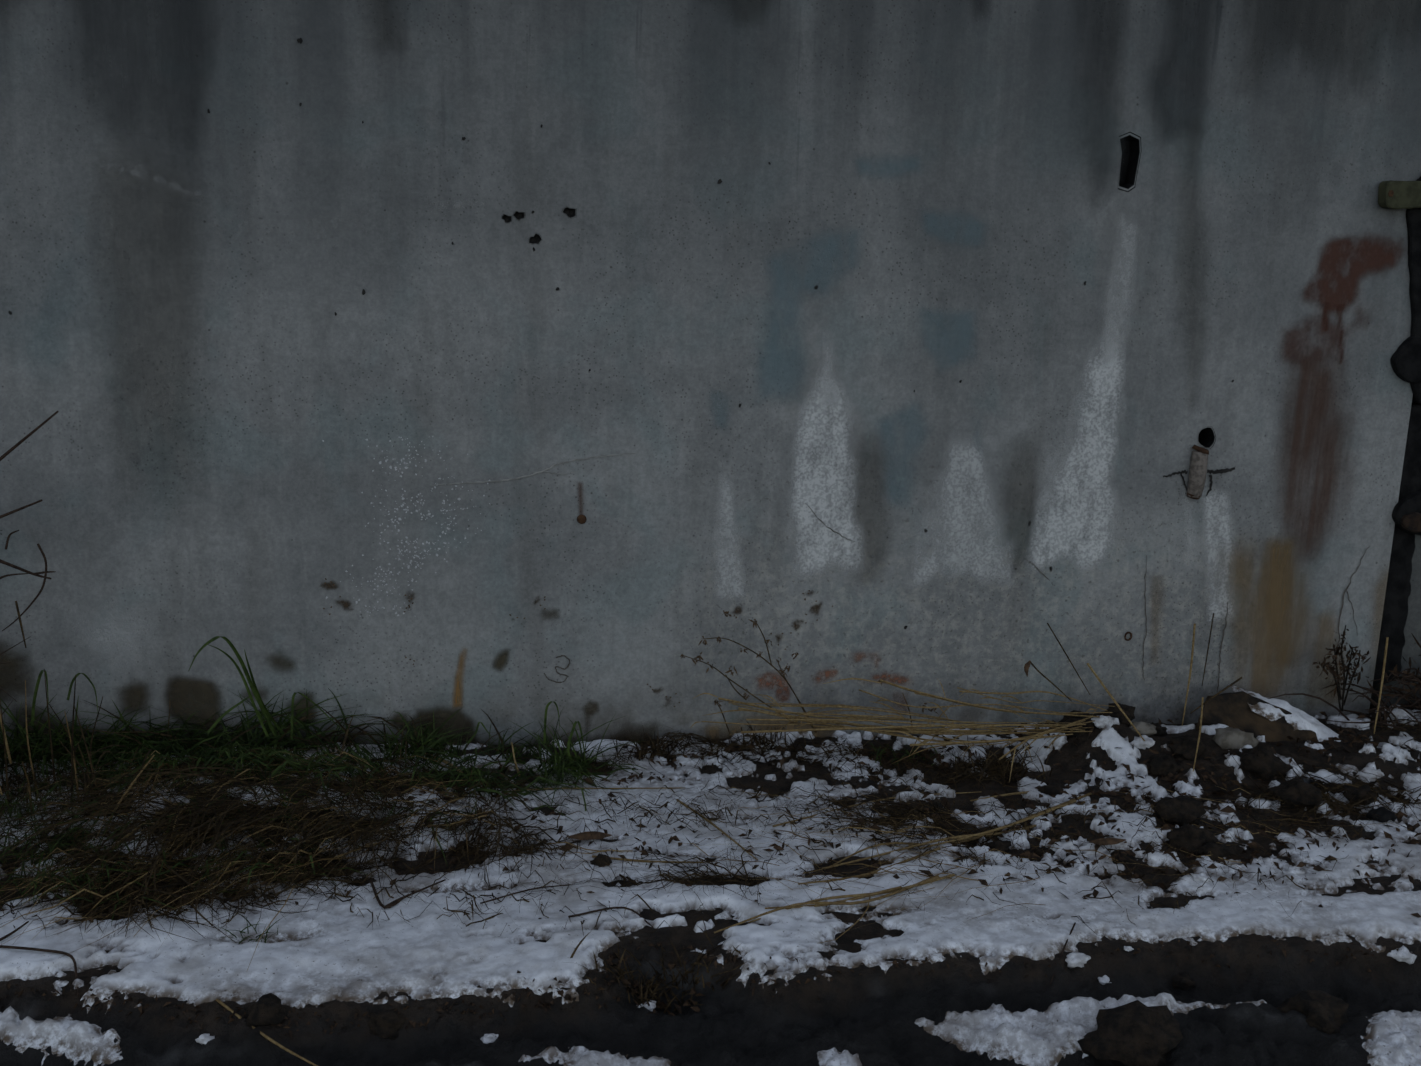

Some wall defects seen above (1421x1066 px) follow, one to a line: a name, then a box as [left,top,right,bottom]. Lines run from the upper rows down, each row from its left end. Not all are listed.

spalling [501,211,534,223]
spalling [562,206,577,219]
spalling [529,233,543,252]
leakage [914,229,1133,583]
leakage [792,348,882,577]